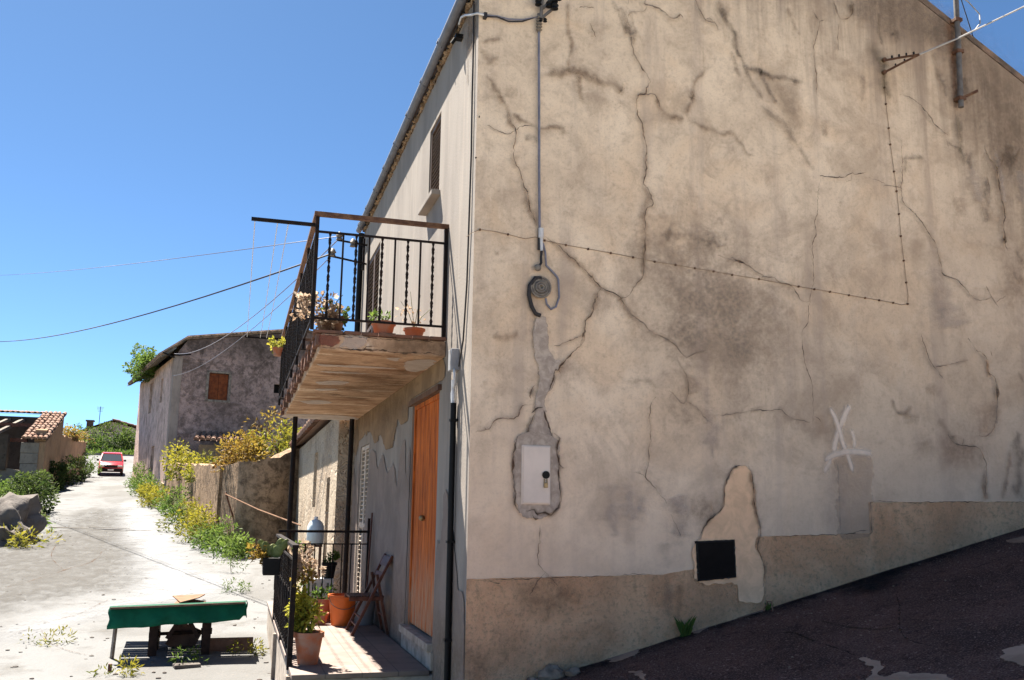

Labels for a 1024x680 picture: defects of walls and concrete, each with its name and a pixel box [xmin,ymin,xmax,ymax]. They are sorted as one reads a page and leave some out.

crack [477,0,1007,593]
peeling [282,358,445,646]
peeling [430,490,464,680]
peeling [692,465,765,603]